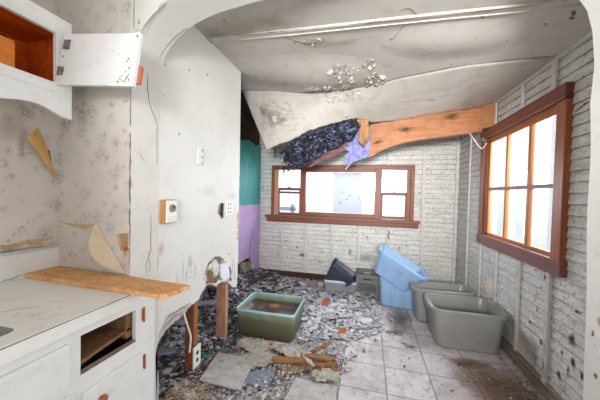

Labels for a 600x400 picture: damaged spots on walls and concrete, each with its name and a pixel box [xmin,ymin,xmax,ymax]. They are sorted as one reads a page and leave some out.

peeling [301,58,389,104]
spalling [202,233,258,285]